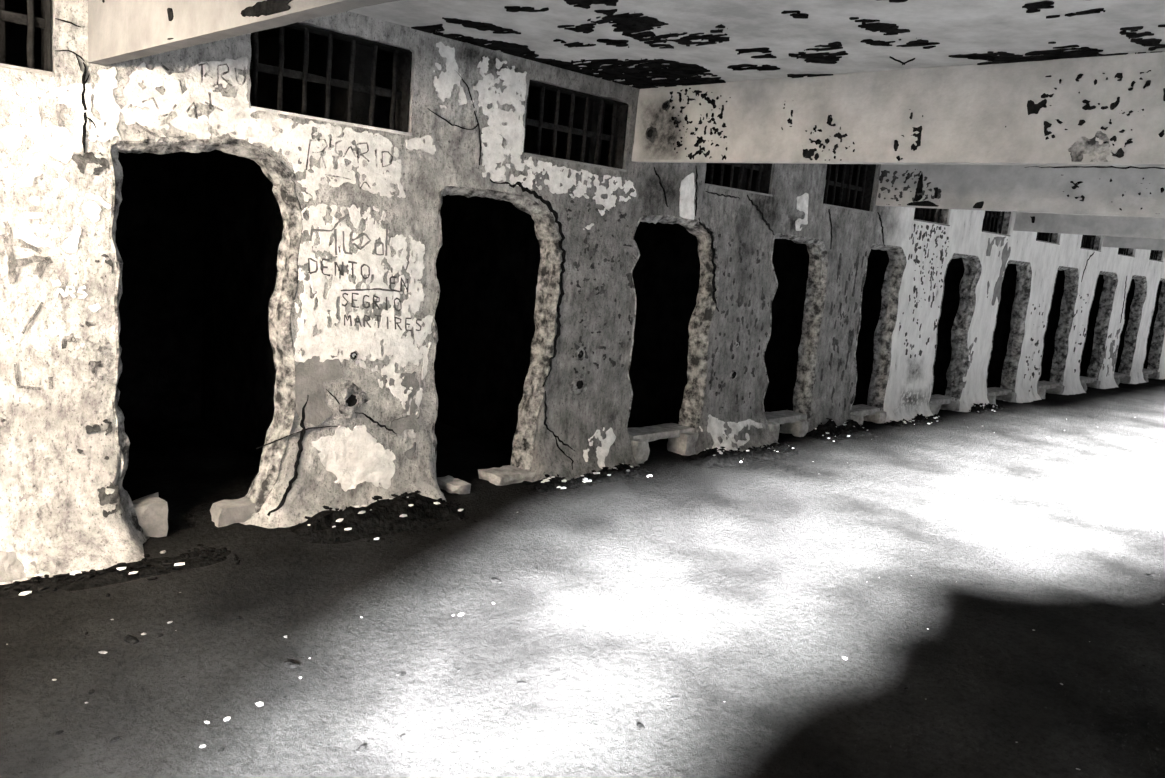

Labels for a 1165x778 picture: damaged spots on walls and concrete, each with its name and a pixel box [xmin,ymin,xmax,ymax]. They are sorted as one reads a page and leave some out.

spalling [0,550,56,582]
crack [256,389,396,516]
crack [427,75,575,470]
spalling [0,0,1165,541]